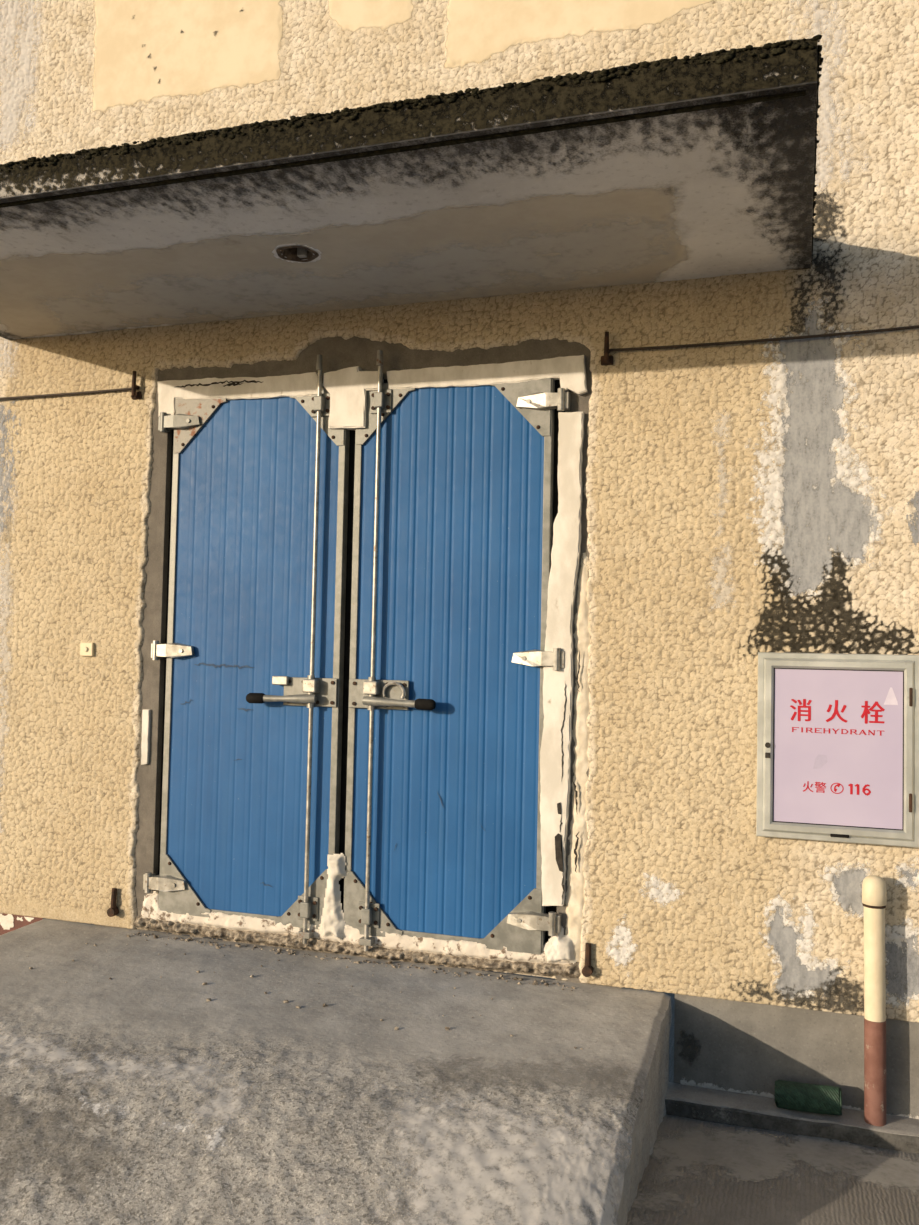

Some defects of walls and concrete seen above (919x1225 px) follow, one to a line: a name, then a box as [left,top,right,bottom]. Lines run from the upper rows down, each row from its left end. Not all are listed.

leakage [0,0,847,334]
leakage [0,189,687,364]
crack [176,380,262,388]
peeling [0,400,21,538]
peeling [746,297,919,599]
leakage [739,544,919,657]
peeling [0,914,34,930]
peeling [759,896,850,999]
peeling [824,863,870,918]
peeling [885,918,919,1006]
peeling [895,858,919,890]